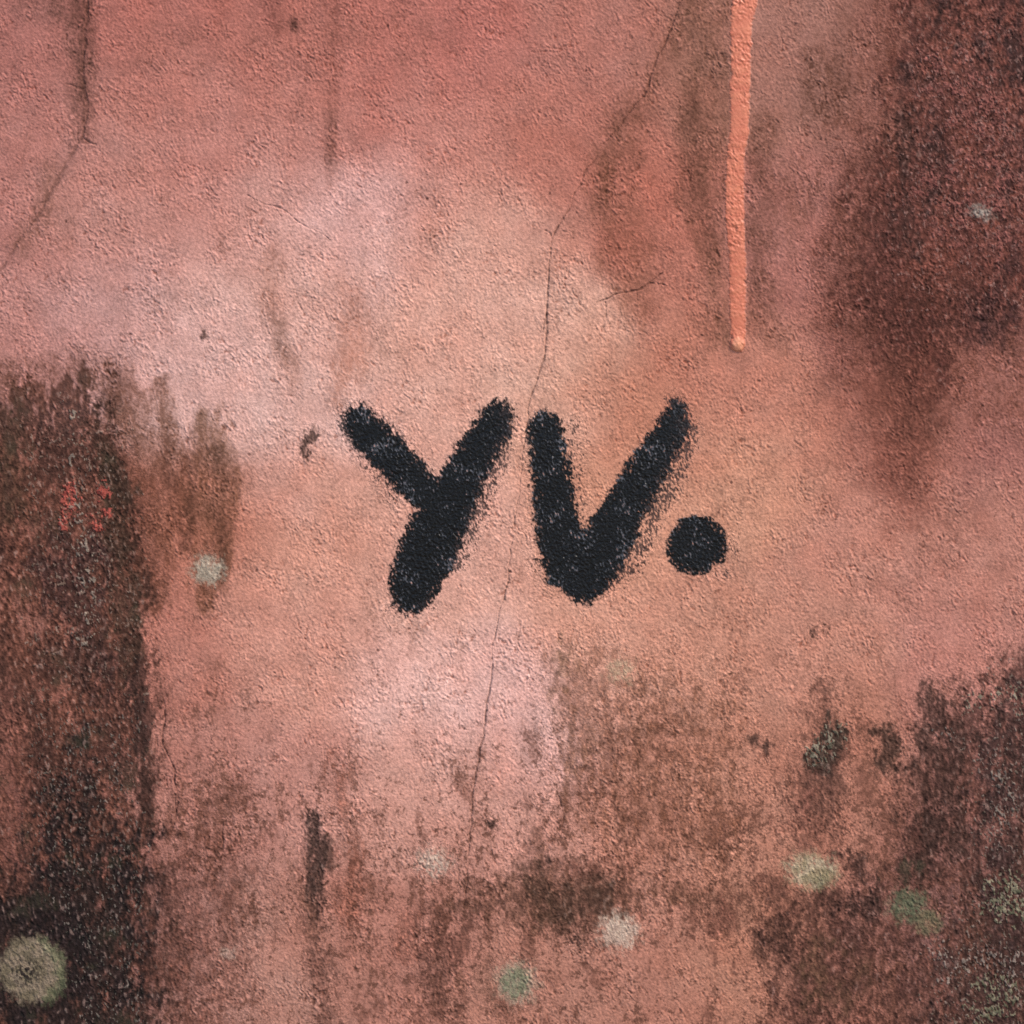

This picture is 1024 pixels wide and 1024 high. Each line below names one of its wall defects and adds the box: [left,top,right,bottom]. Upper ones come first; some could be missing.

crack [526,0,683,424]
leakage [744,0,1024,570]
crack [463,456,522,906]
leakage [0,334,1024,1024]